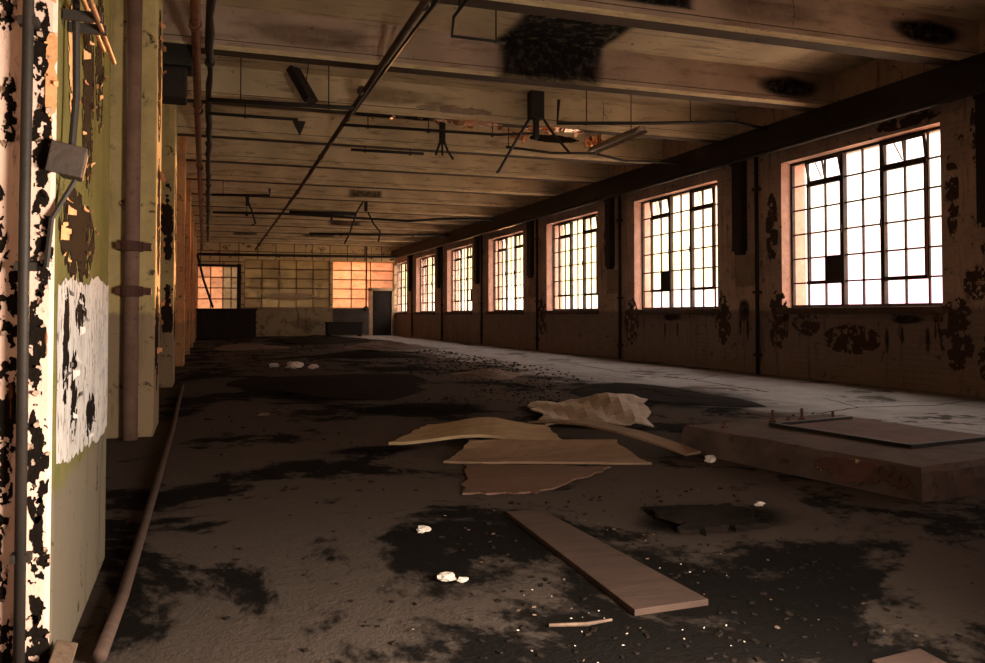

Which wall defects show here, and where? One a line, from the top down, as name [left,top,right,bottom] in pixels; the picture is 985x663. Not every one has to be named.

peeling [0,0,18,32]
peeling [0,73,18,148]
peeling [939,266,985,381]
peeling [0,185,18,602]
peeling [0,619,13,663]